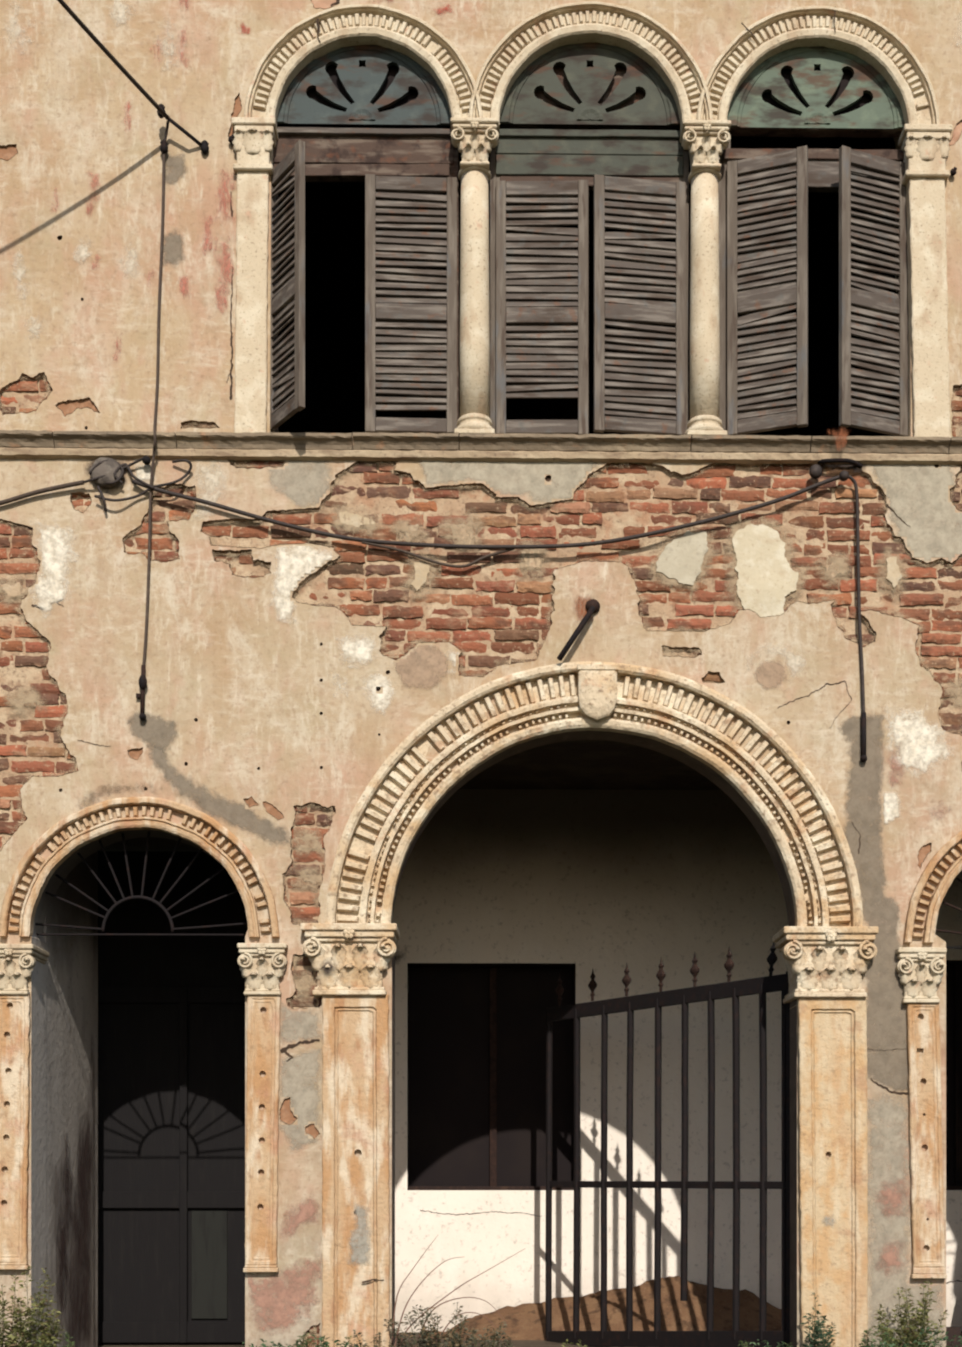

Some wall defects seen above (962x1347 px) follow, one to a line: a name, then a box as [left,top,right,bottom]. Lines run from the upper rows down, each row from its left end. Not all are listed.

flaking render [0,372,100,417]
flaking render [951,384,962,437]
flaking render [122,460,962,735]
flaking render [0,519,79,851]
crack [778,681,852,728]
flaking render [127,747,143,760]
flaking render [243,796,336,925]
crack [280,1039,320,1062]
flaking render [279,1097,320,1139]
damp [55,1070,94,1347]